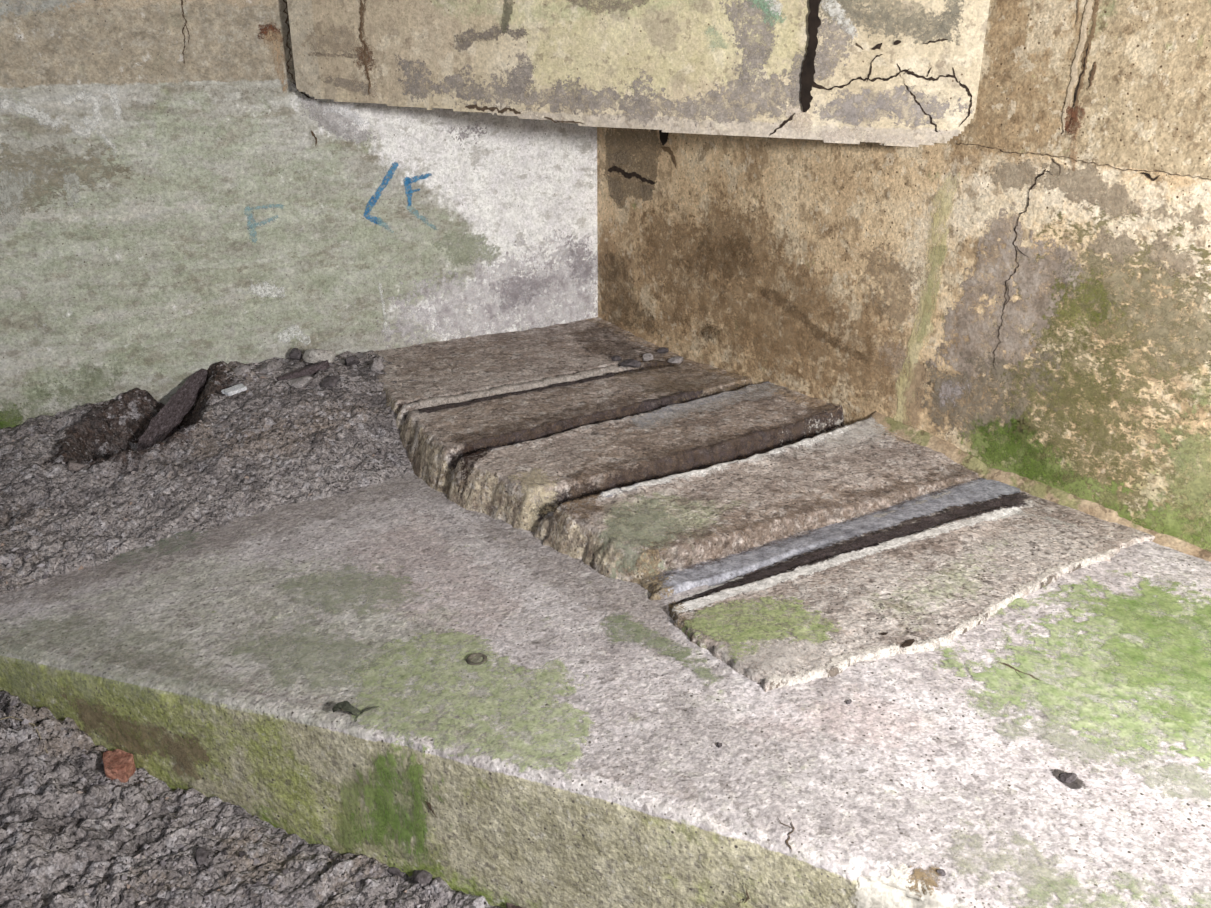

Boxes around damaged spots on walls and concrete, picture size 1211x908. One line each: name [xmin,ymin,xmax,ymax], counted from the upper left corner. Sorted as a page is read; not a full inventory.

crack [770,0,1211,368]